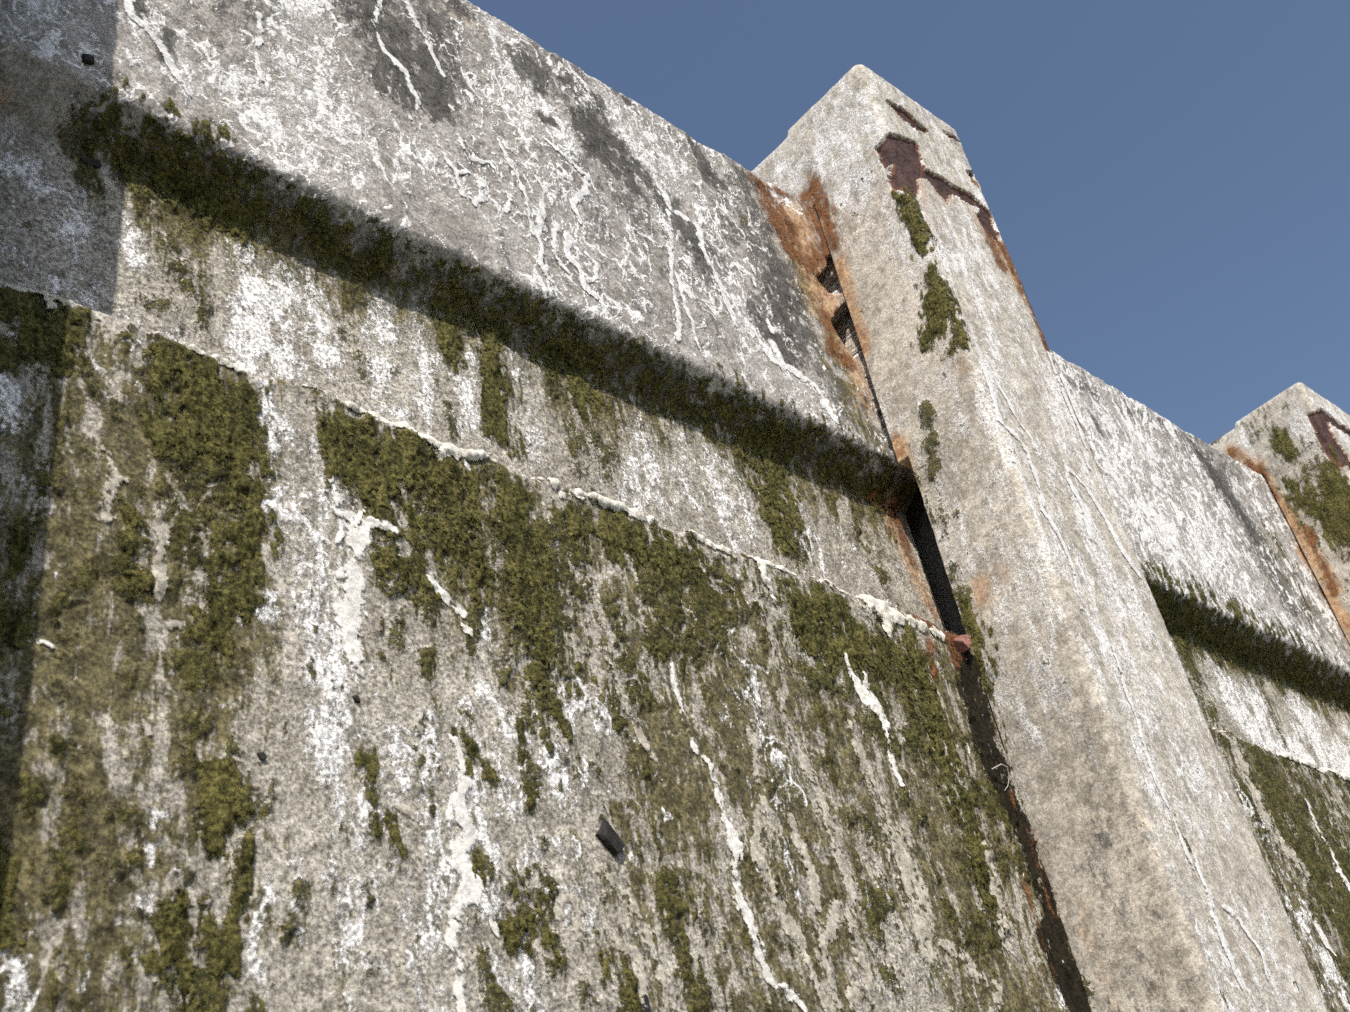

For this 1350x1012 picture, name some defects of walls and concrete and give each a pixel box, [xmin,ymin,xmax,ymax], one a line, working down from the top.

water stain [132,0,179,65]
water stain [332,0,457,131]
rust [750,173,843,277]
rust [818,308,857,371]
water stain [152,331,496,461]
rust [1227,447,1280,500]
water stain [327,476,399,676]
water stain [426,572,473,635]
rust [910,612,962,677]
rust [1302,525,1338,601]
water stain [520,474,1091,1012]
water stain [444,734,500,1012]